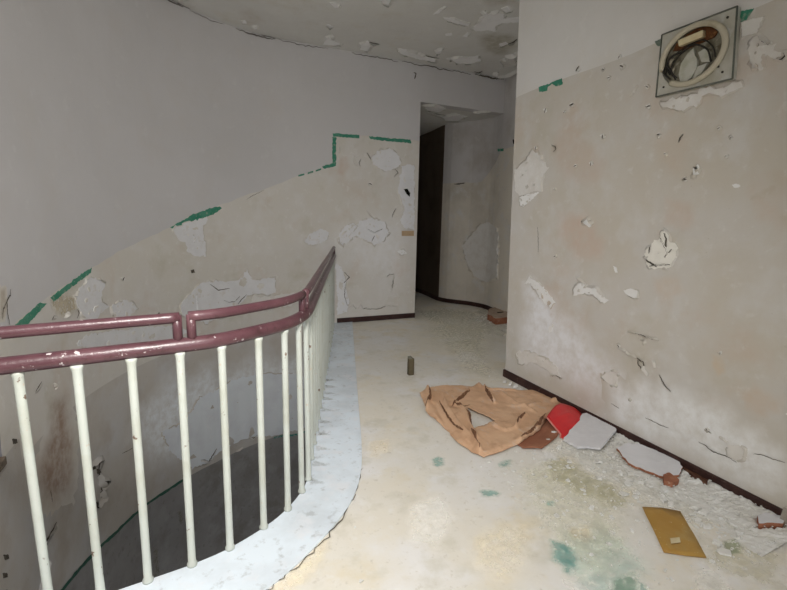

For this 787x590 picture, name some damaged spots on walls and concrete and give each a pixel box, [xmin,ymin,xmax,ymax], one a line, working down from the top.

peeling [395,39,518,77]
peeling [741,16,787,71]
peeling [645,79,745,113]
peeling [353,147,416,231]
peeling [513,146,549,207]
spalling [643,228,679,271]
peeling [179,269,299,325]
leakage [35,383,80,518]